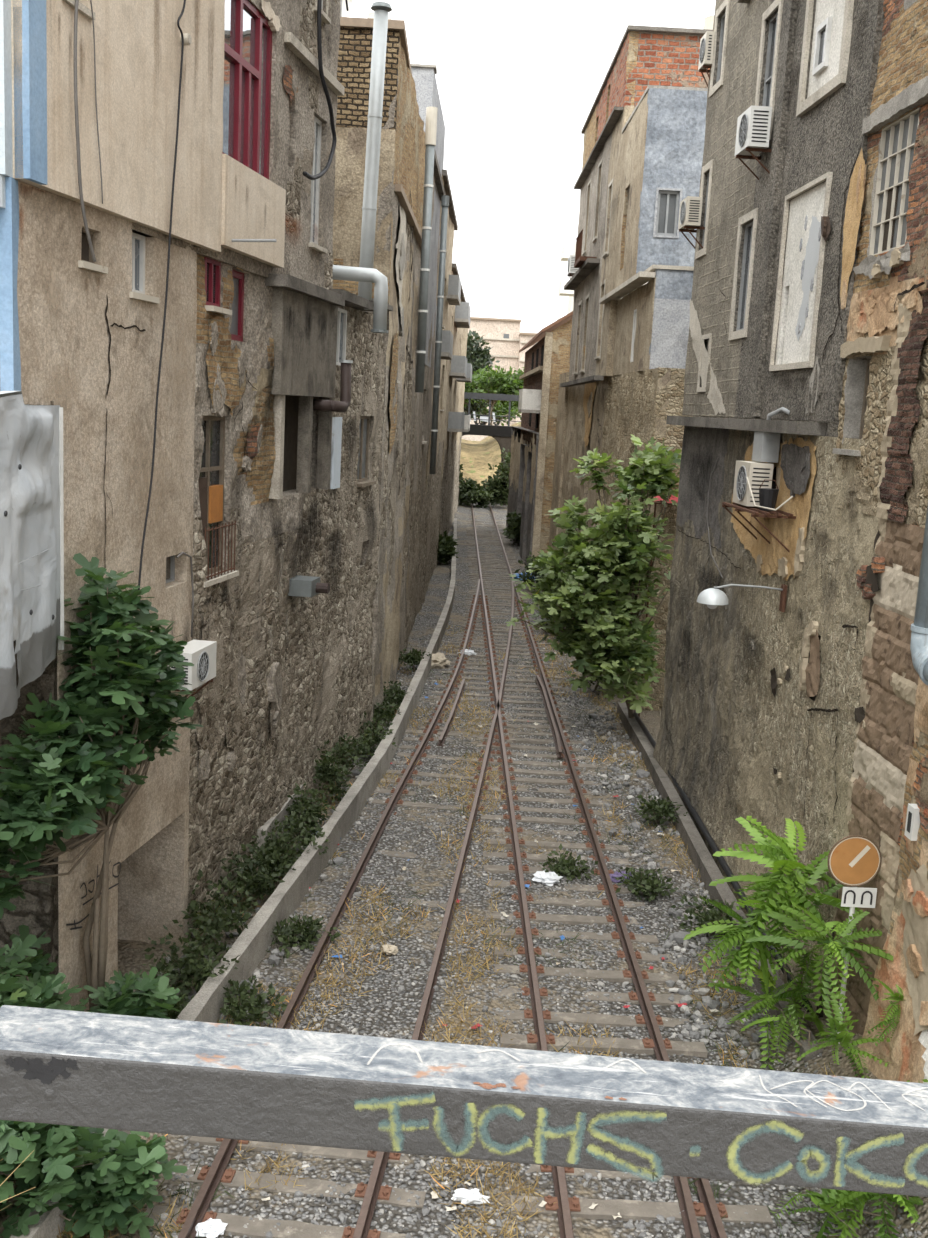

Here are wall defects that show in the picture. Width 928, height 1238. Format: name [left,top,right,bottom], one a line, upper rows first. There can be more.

crack [104,297,145,545]
spalling [804,356,824,420]
peeling [731,436,816,581]
spalling [856,556,885,599]